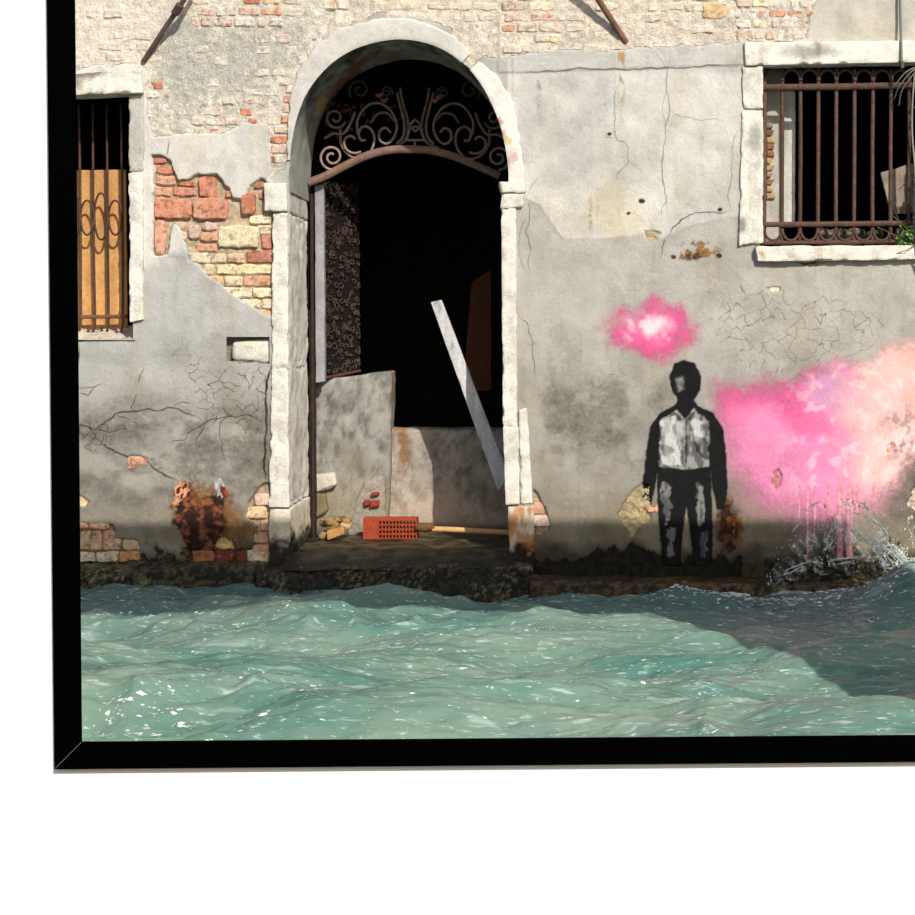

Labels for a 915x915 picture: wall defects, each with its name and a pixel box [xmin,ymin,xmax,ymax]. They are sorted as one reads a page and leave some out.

peeling [75,0,819,317]
crack [79,372,270,478]
spalling [80,520,141,562]
corrosion [171,481,256,556]
corrosion [716,499,743,554]
peeling [907,488,915,511]